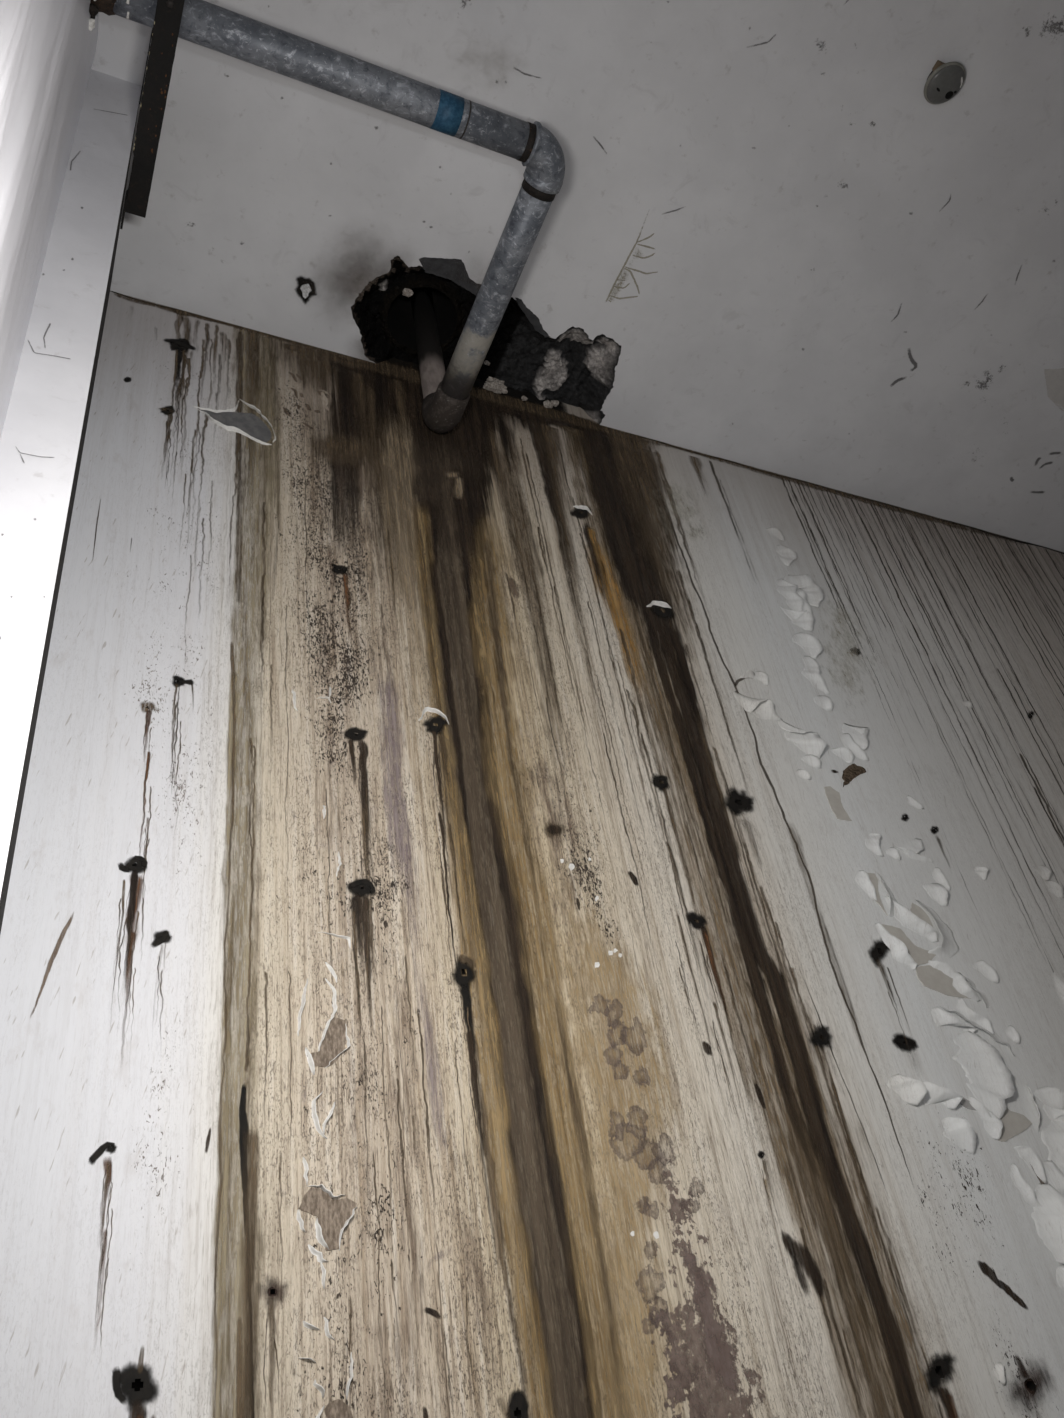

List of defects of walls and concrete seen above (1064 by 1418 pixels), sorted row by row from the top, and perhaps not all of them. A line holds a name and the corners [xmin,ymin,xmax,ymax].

spalling [193,399,276,445]
corrosion [583,525,607,592]
peeling [733,669,869,821]
water stain [782,479,1064,926]
corrosion [116,871,142,994]
corrosion [348,739,373,1000]
water stain [118,295,1006,1418]
peeling [297,962,351,1075]
peeling [855,833,1064,1290]
corrosion [99,1160,112,1272]
peeling [297,1157,357,1289]
corrosion [130,1401,154,1418]